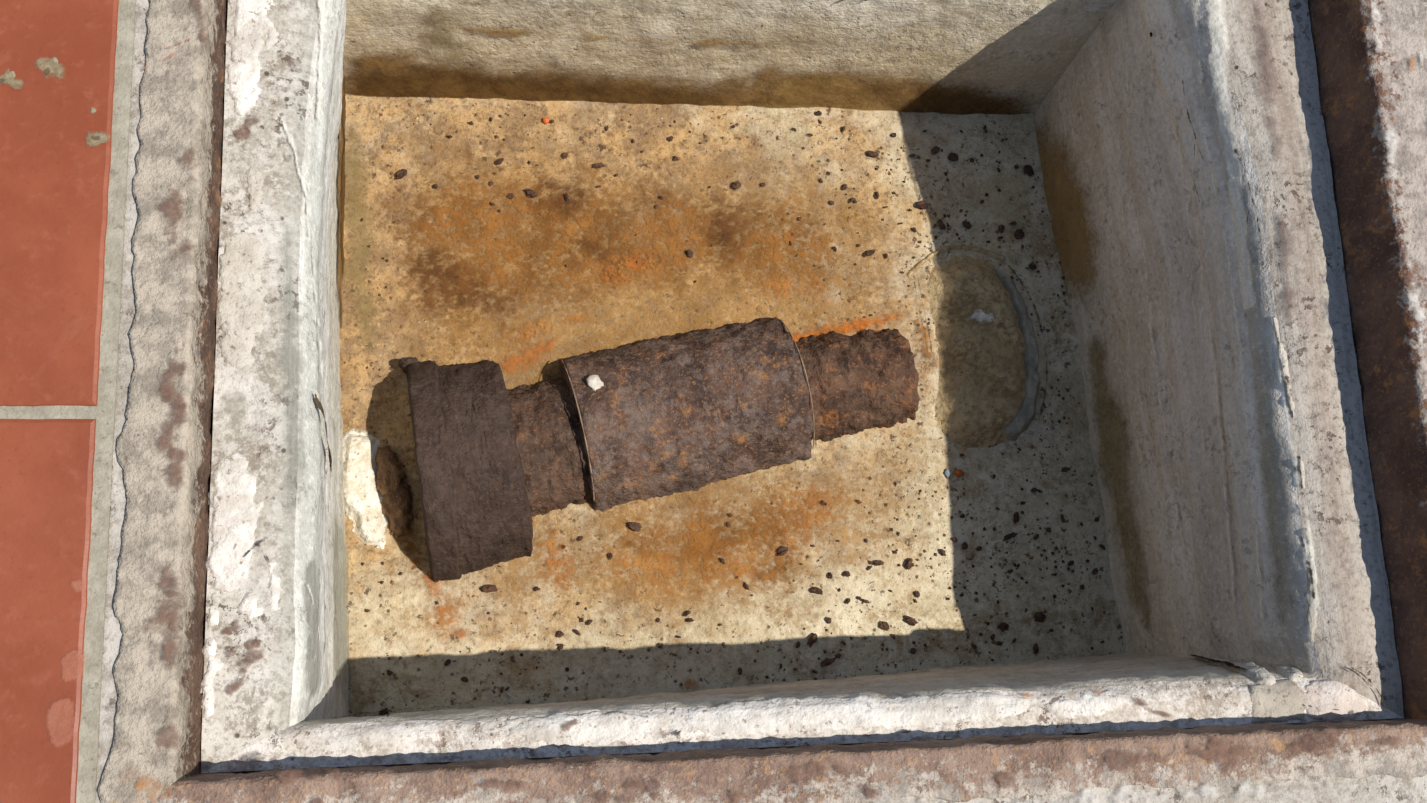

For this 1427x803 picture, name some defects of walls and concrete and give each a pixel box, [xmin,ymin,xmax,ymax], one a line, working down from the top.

water stain [283,124,311,213]
corrosion [397,177,938,414]
water stain [314,0,1029,375]
water stain [1036,128,1097,296]
corrosion [509,482,877,604]